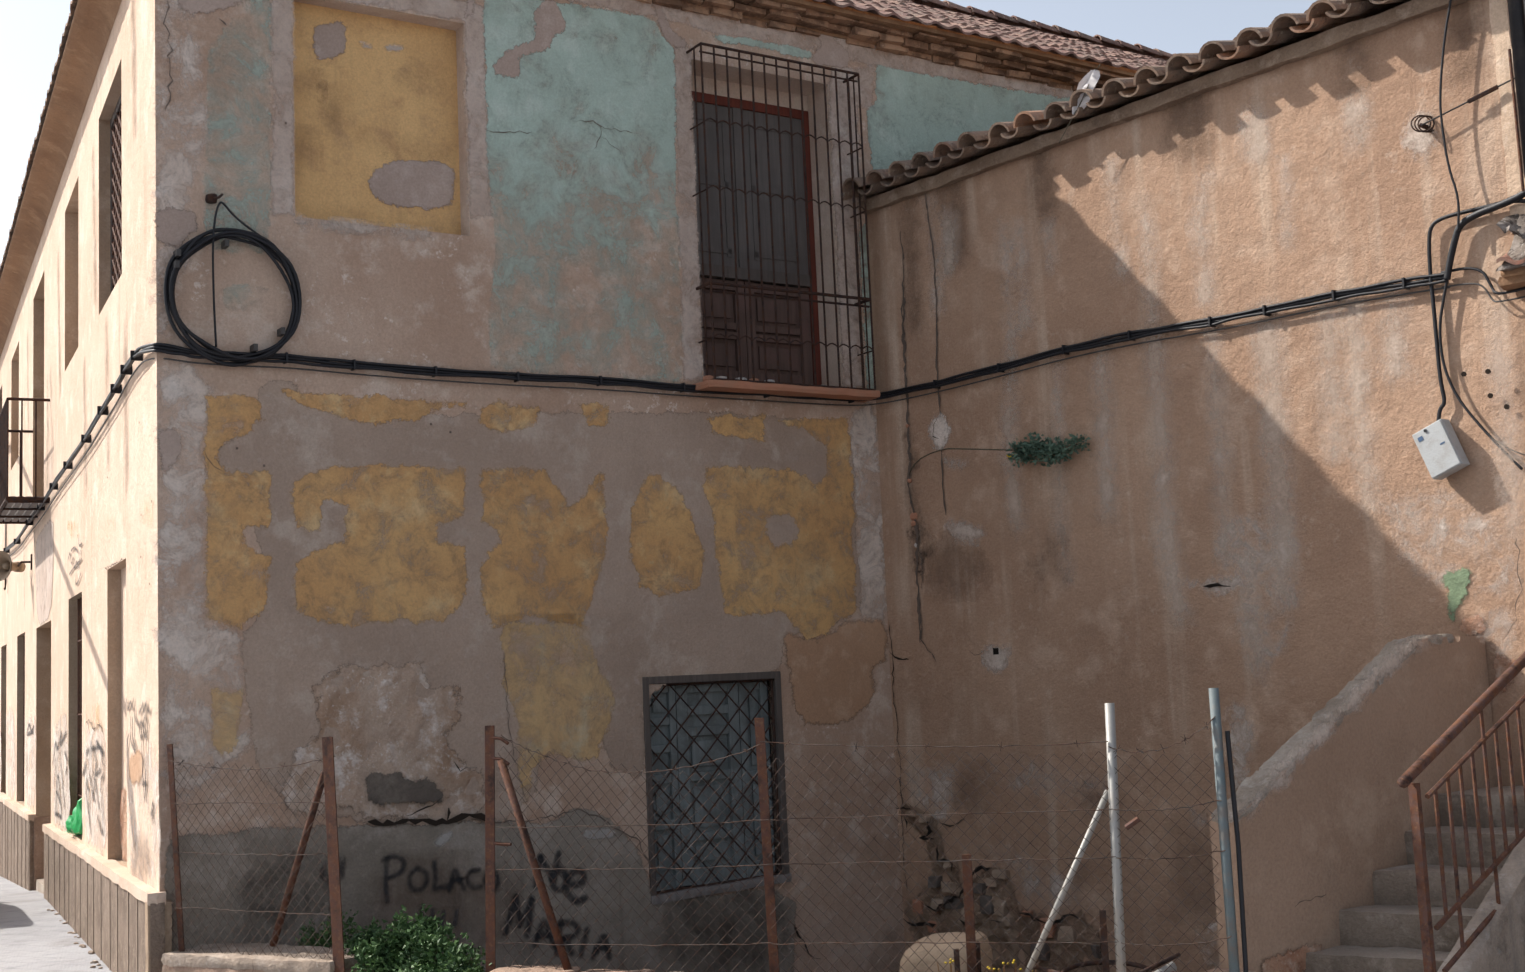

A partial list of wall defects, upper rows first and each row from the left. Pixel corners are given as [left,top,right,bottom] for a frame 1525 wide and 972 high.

peeling [151,247,188,331]
peeling [154,86,242,211]
peeling [204,177,271,241]
peeling [483,0,678,361]
peeling [715,19,812,58]
peeling [866,65,1070,170]
peeling [281,388,540,433]
peeling [629,223,887,640]
peeling [140,363,272,791]
peeling [290,463,609,628]
peeling [281,661,485,821]
spalling [895,803,1102,972]